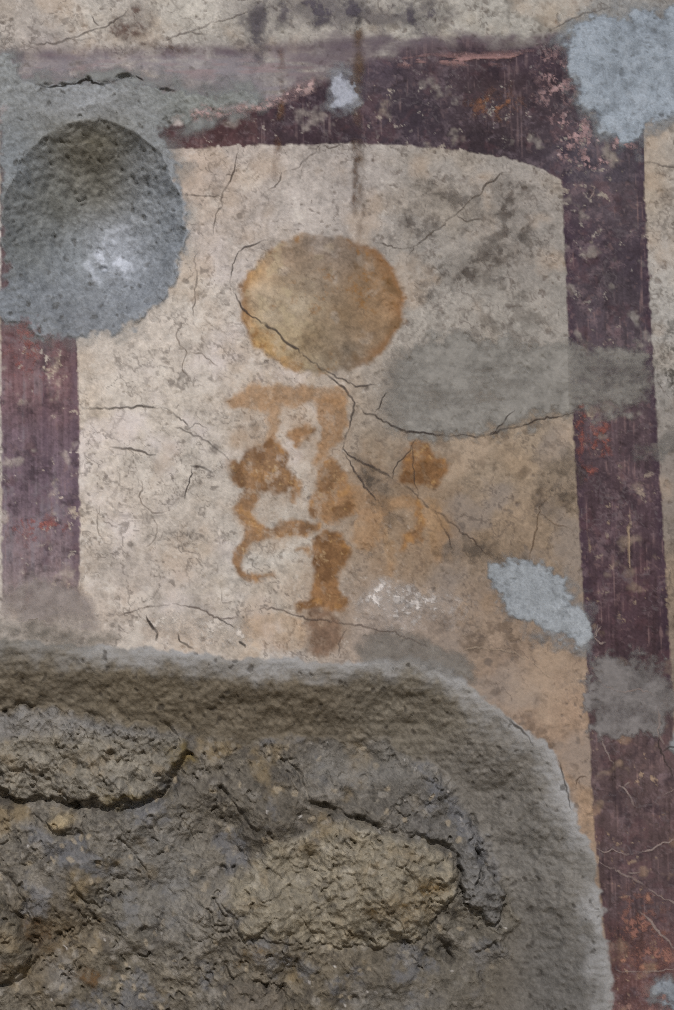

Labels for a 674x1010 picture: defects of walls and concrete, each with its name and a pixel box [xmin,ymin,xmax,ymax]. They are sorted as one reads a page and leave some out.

crack [239,301,299,349]
crack [332,374,435,435]
crack [345,451,415,493]
spalling [0,615,674,1010]